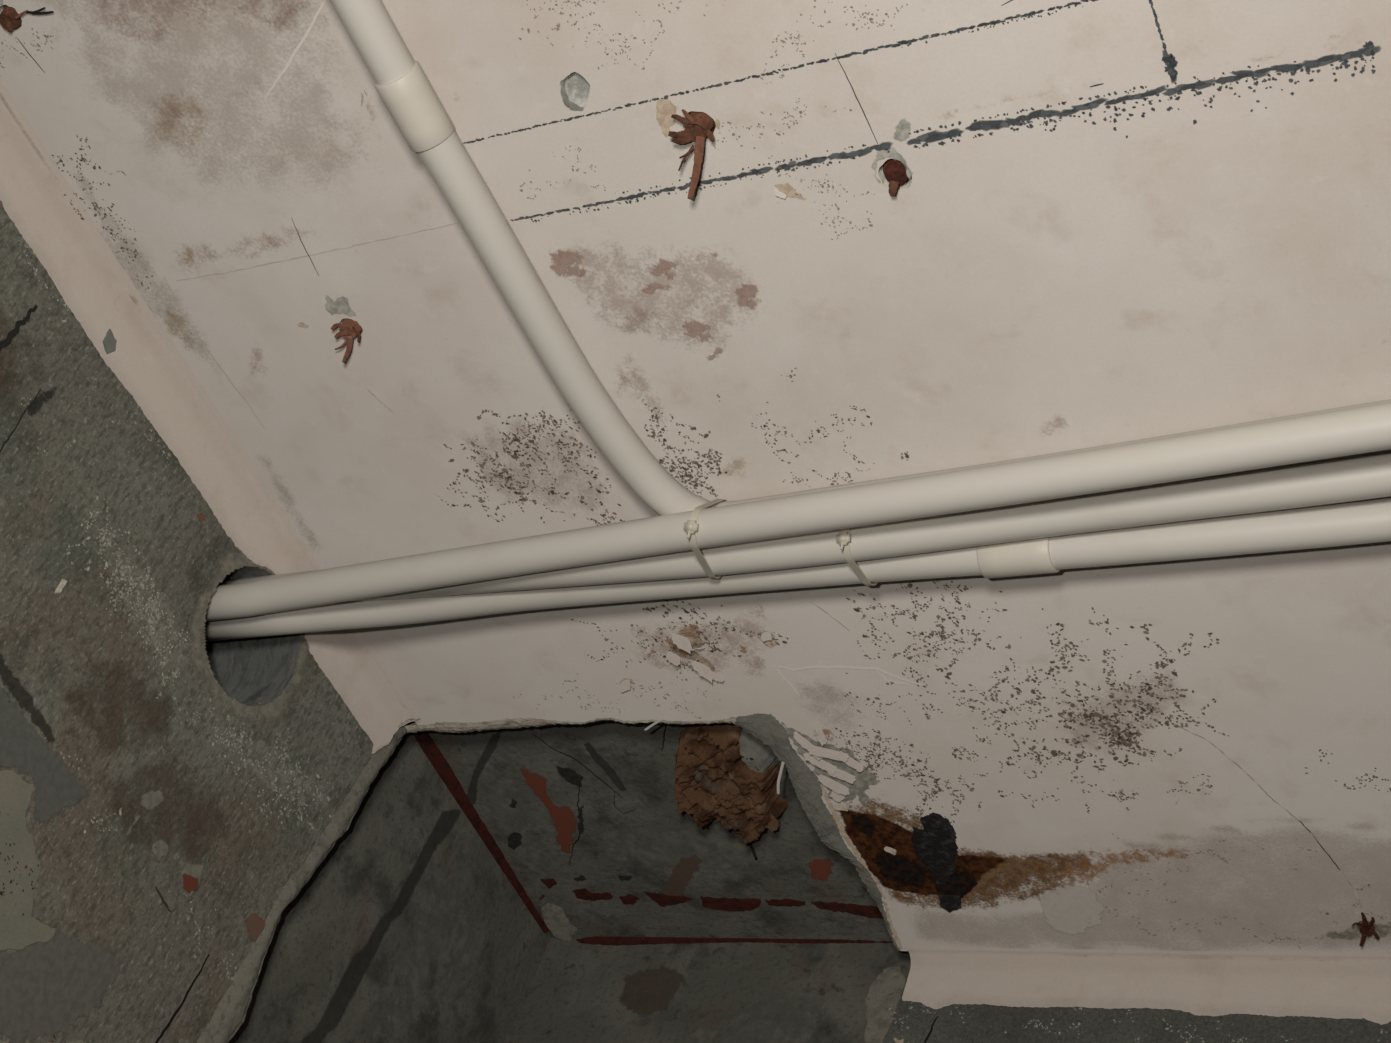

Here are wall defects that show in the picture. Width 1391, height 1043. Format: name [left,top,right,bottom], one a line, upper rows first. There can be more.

leakage [550,250,585,277]
leakage [642,259,676,294]
leakage [736,284,758,309]
crack [0,305,38,351]
leakage [684,322,722,360]
crack [0,390,41,452]
leakage [441,409,625,525]
leakage [536,598,788,719]
leakage [815,577,1229,907]
flaking render [405,713,901,951]
corrosion [1059,849,1187,886]
leakage [954,840,1301,946]